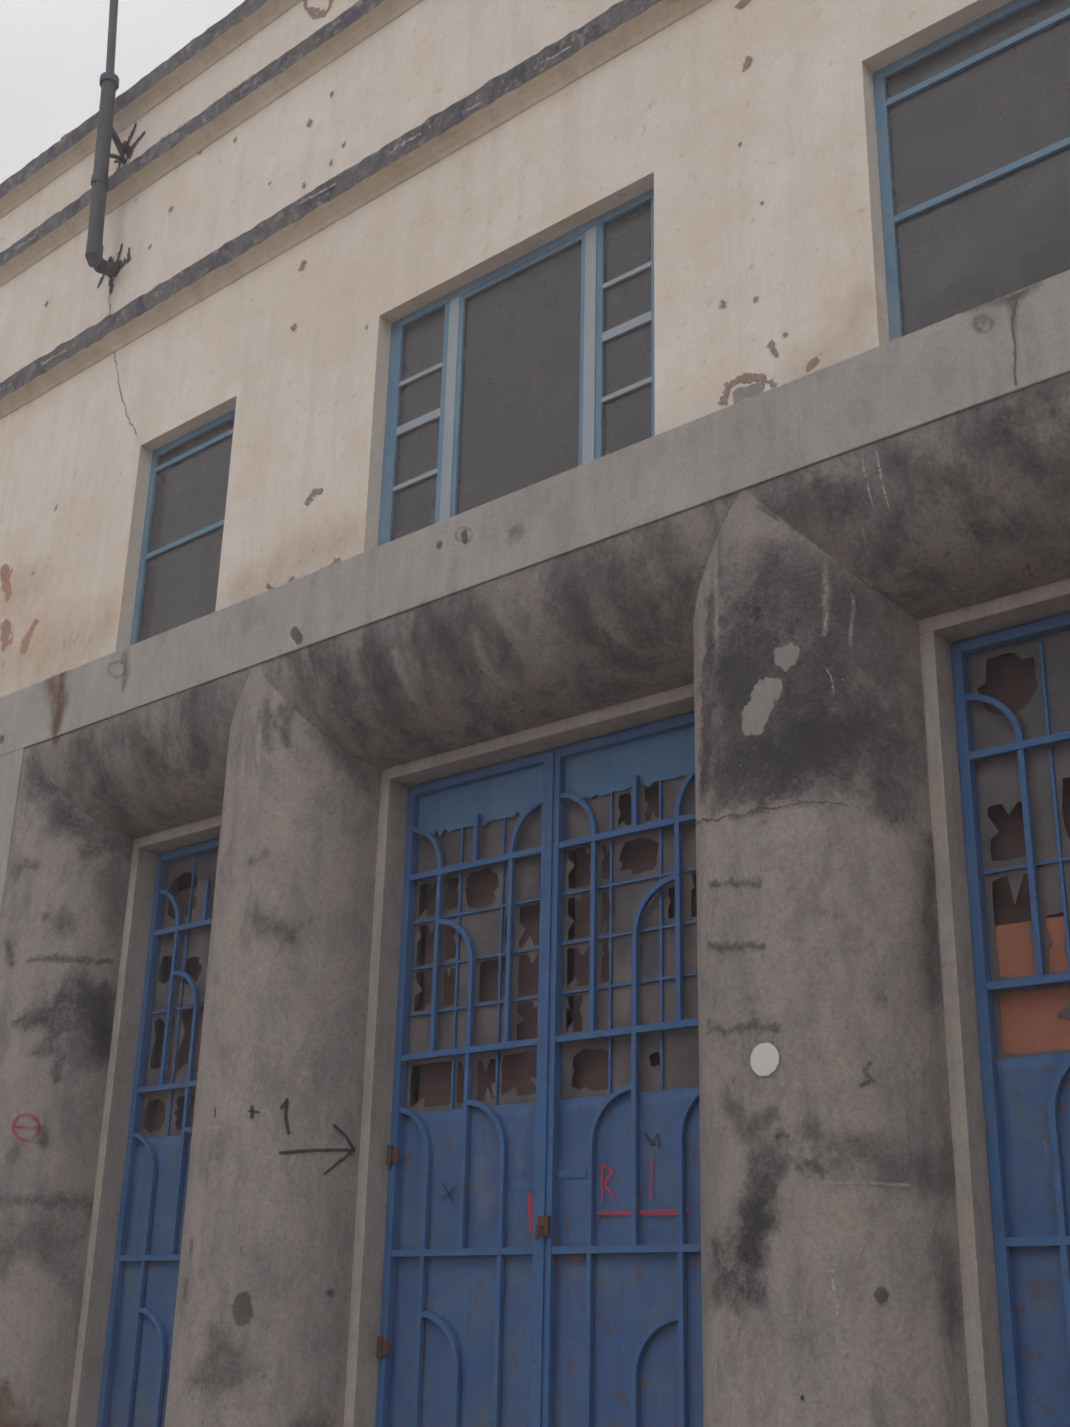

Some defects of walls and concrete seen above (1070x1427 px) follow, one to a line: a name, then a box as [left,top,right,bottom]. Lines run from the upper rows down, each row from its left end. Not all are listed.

peeling [767,332,788,357]
peeling [806,356,820,372]
crack [114,357,137,435]
spalling [718,372,777,405]
peeling [0,564,39,655]
crack [694,801,858,827]
leakage [713,1133,842,1315]